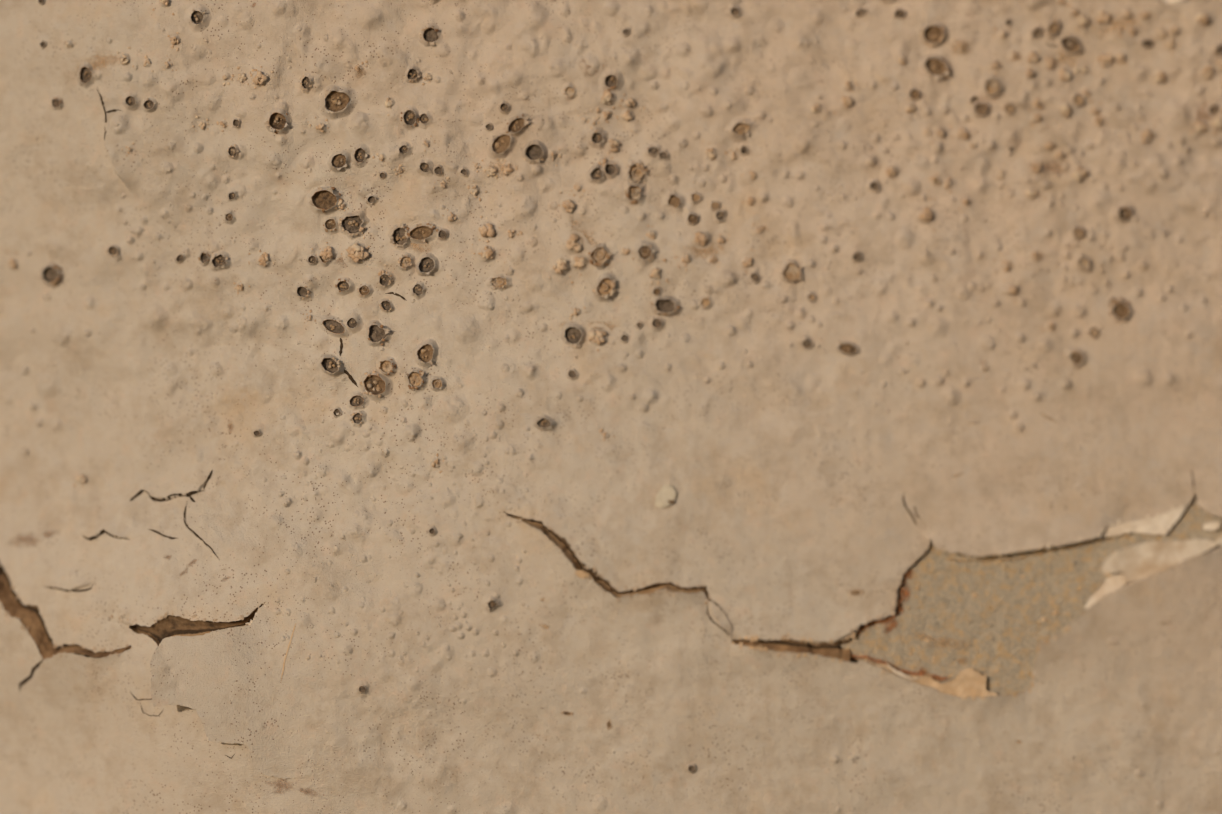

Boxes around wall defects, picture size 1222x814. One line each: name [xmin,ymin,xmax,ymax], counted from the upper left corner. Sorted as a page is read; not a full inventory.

crack [902,493,920,525]
crack [0,566,266,690]
crack [504,512,856,663]
peeling [841,494,1222,700]